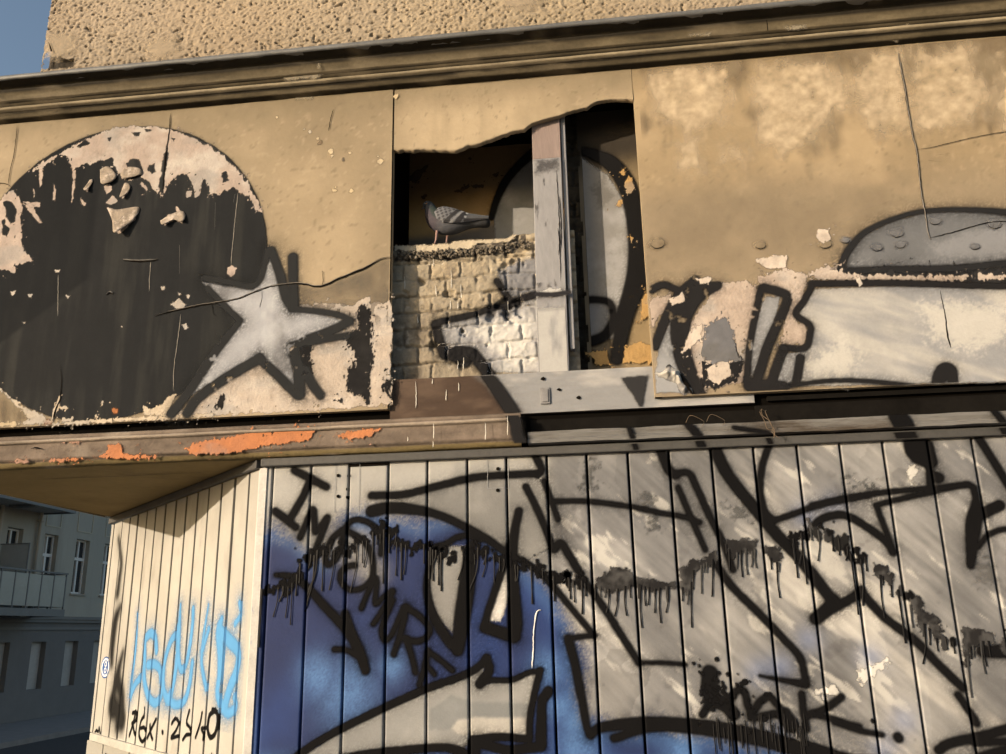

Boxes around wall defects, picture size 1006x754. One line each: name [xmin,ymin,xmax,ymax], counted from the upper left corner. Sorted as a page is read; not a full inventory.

peeling [0,125,263,273]
peeling [0,292,396,465]
crack [155,256,391,316]
spalling [607,169,634,211]
peeling [585,254,1006,395]
spalling [810,225,836,245]
crack [898,55,1006,238]